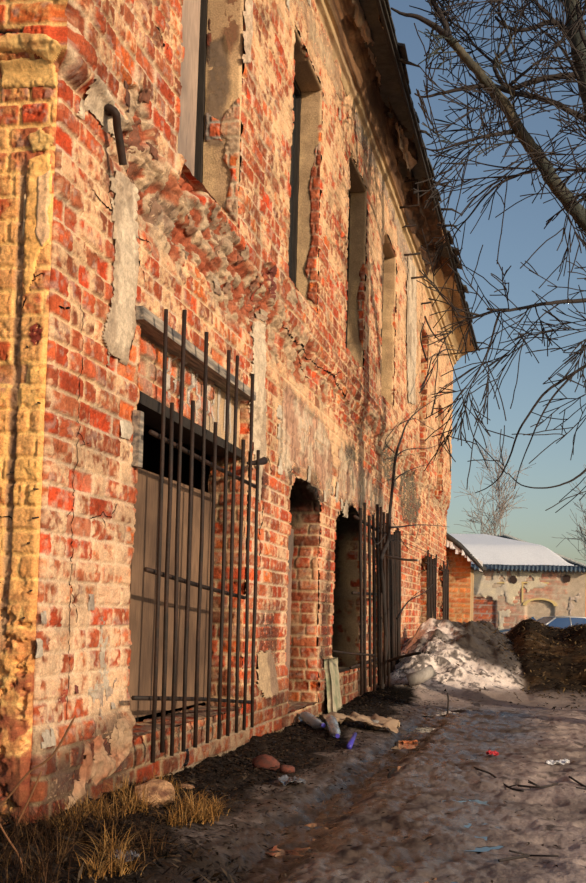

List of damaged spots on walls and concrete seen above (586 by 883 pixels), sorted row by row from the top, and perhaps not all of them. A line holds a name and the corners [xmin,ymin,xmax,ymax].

flaking render [77,74,158,161]
water stain [207,38,230,145]
spalling [286,0,449,405]
crack [282,325,349,404]